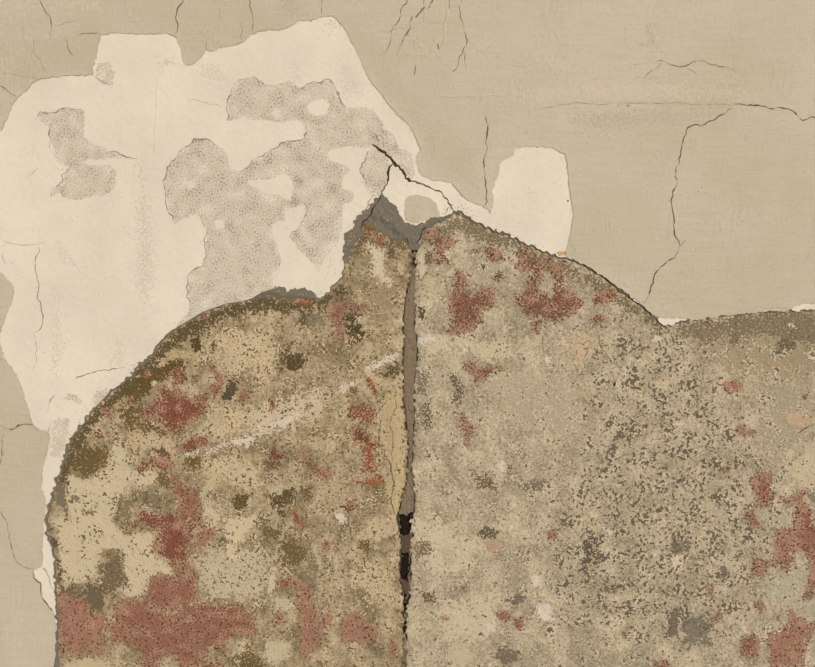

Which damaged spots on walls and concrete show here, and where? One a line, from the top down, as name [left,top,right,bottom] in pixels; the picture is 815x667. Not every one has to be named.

crack [1,0,100,96]
crack [640,60,733,78]
crack [360,196,427,244]
crack [481,118,489,204]
crack [644,104,815,303]
peeling [0,16,583,631]
crack [576,335,624,372]
peeling [652,314,699,327]
peeling [782,303,815,312]
crack [379,265,418,639]
crack [1,513,54,615]